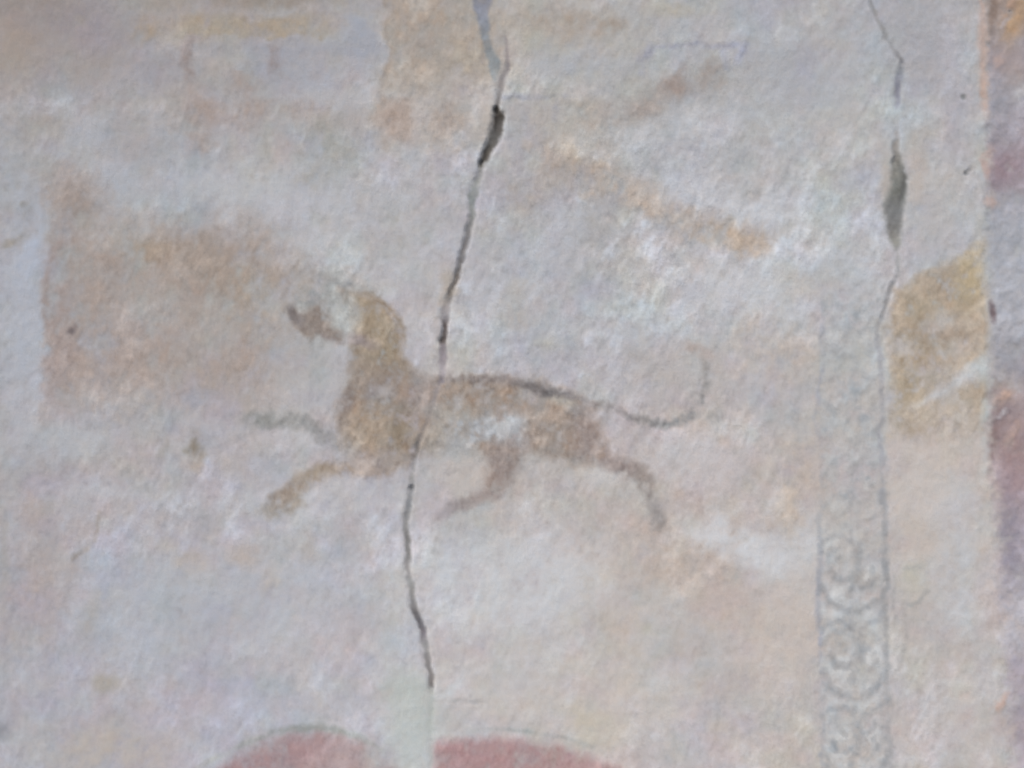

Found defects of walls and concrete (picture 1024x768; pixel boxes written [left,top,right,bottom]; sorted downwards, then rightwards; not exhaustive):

crack [400,0,513,768]
crack [867,0,910,375]